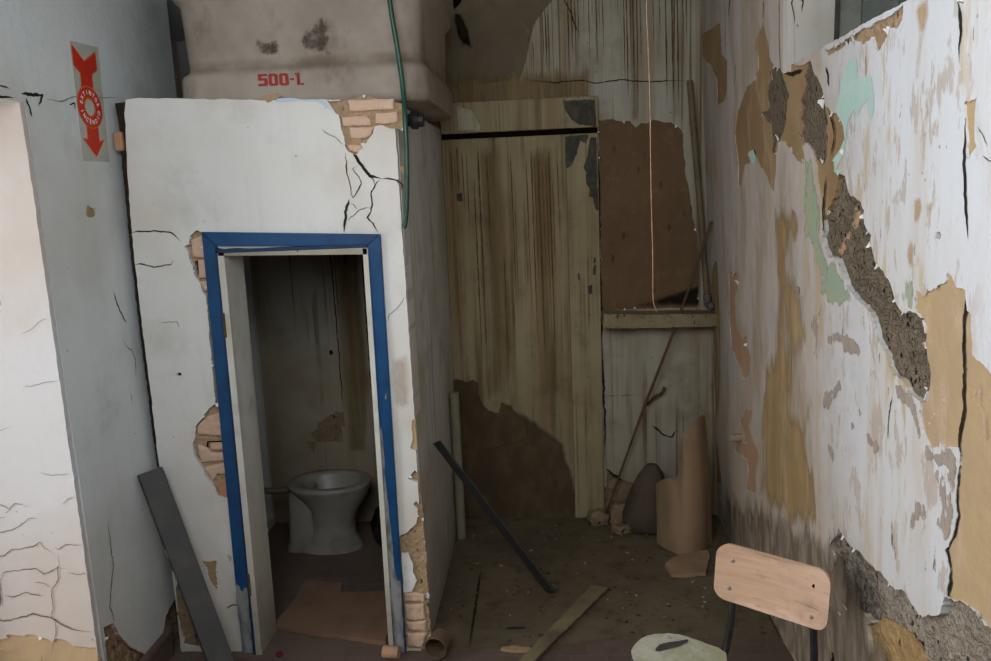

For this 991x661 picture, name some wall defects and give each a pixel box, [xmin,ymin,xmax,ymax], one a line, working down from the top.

crack [0,503,90,661]
crack [323,130,403,233]
flaking render [328,95,403,155]
crack [361,254,404,408]
flaking render [380,428,431,653]
spalling [443,0,552,86]
water stain [485,152,514,382]
water stain [446,72,588,103]
spalling [564,99,699,310]
water stain [724,211,885,661]
peeling [733,23,991,661]
crack [946,300,967,597]